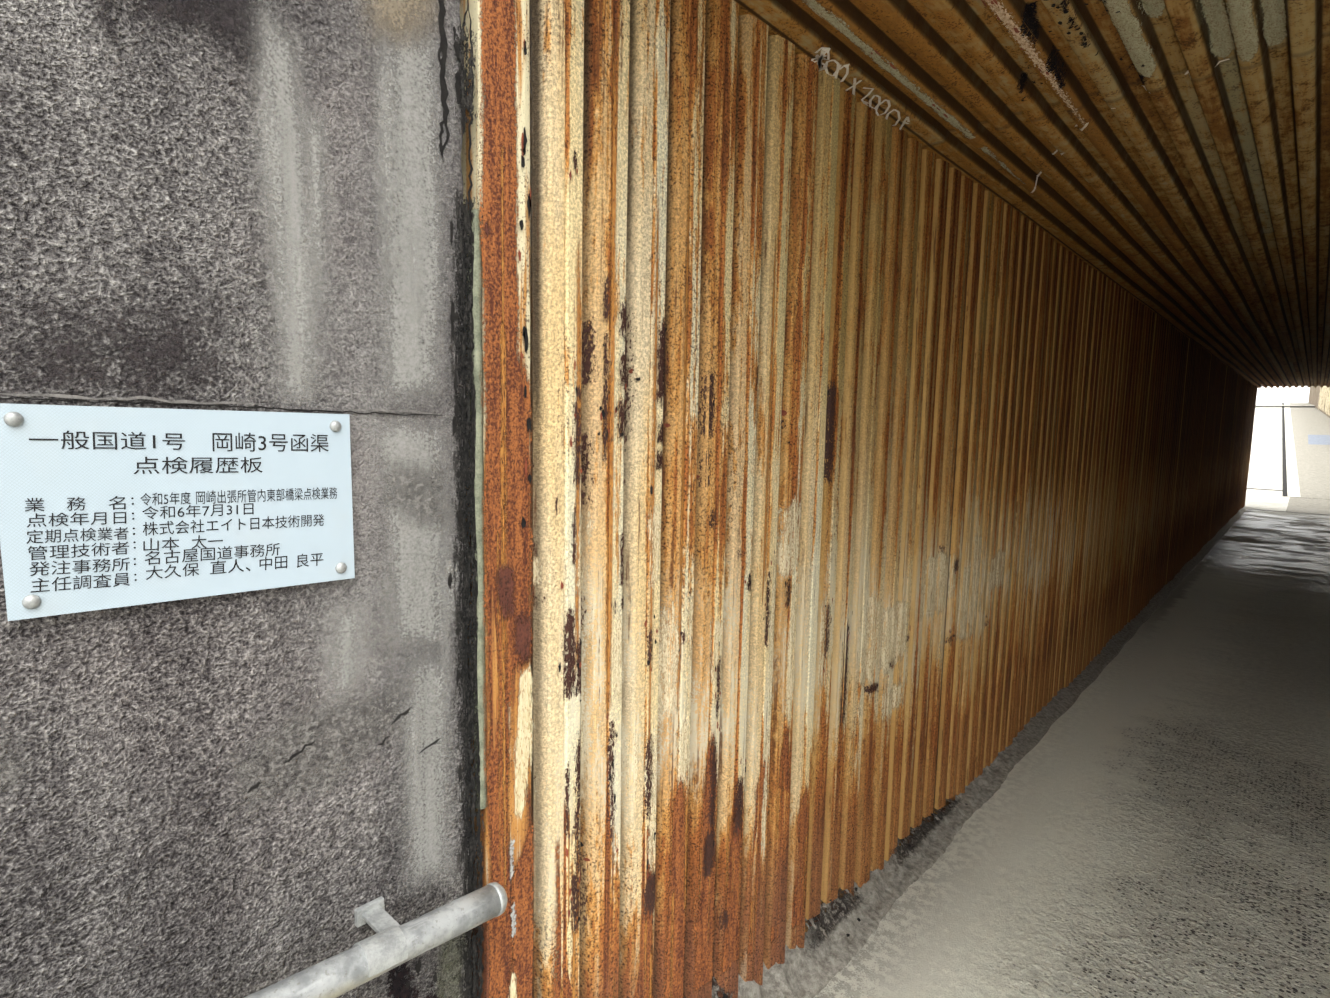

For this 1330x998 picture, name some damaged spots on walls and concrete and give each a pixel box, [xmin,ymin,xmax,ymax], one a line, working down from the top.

leakage [453,22,479,134]
rust [479,0,534,998]
rust [607,38,617,714]
rust [648,216,659,745]
rust [677,168,690,709]
rust [762,240,776,601]
rust [551,805,576,998]
rust [604,859,615,998]
rust [633,728,809,998]